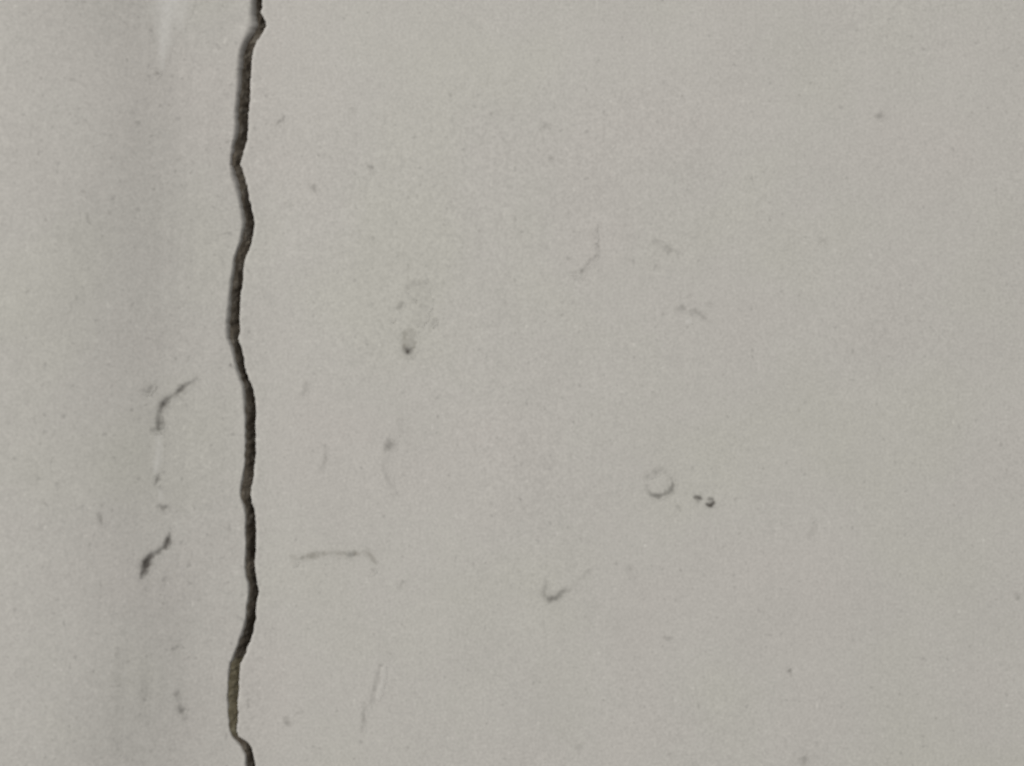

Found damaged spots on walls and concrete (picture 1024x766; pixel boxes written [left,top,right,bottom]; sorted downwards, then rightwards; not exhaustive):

crack [223,0,266,766]